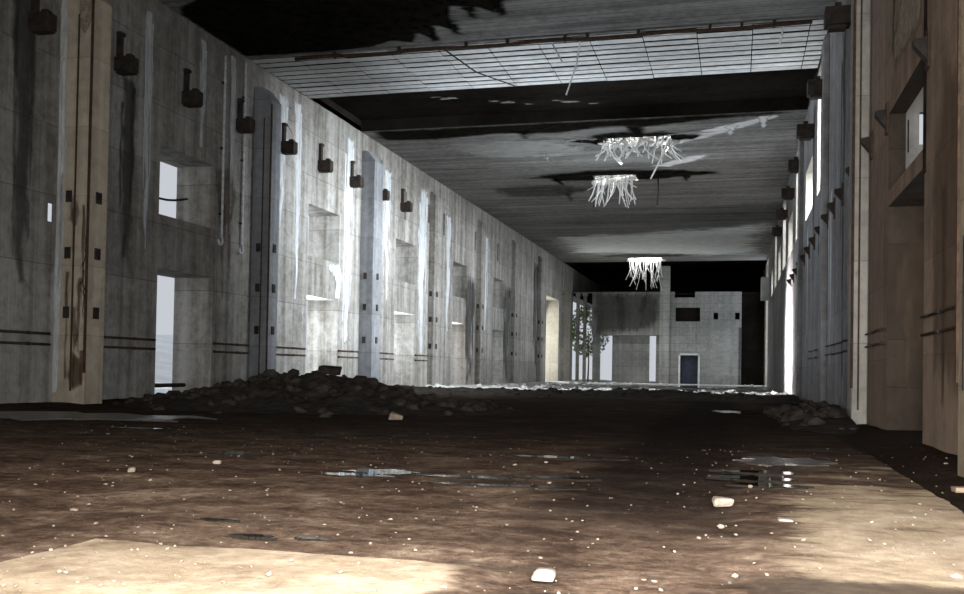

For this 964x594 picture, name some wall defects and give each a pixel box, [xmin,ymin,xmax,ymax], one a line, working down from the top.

leakage [181,0,506,210]
spalling [532,132,716,208]
rust [64,205,85,387]
spalling [606,254,686,290]